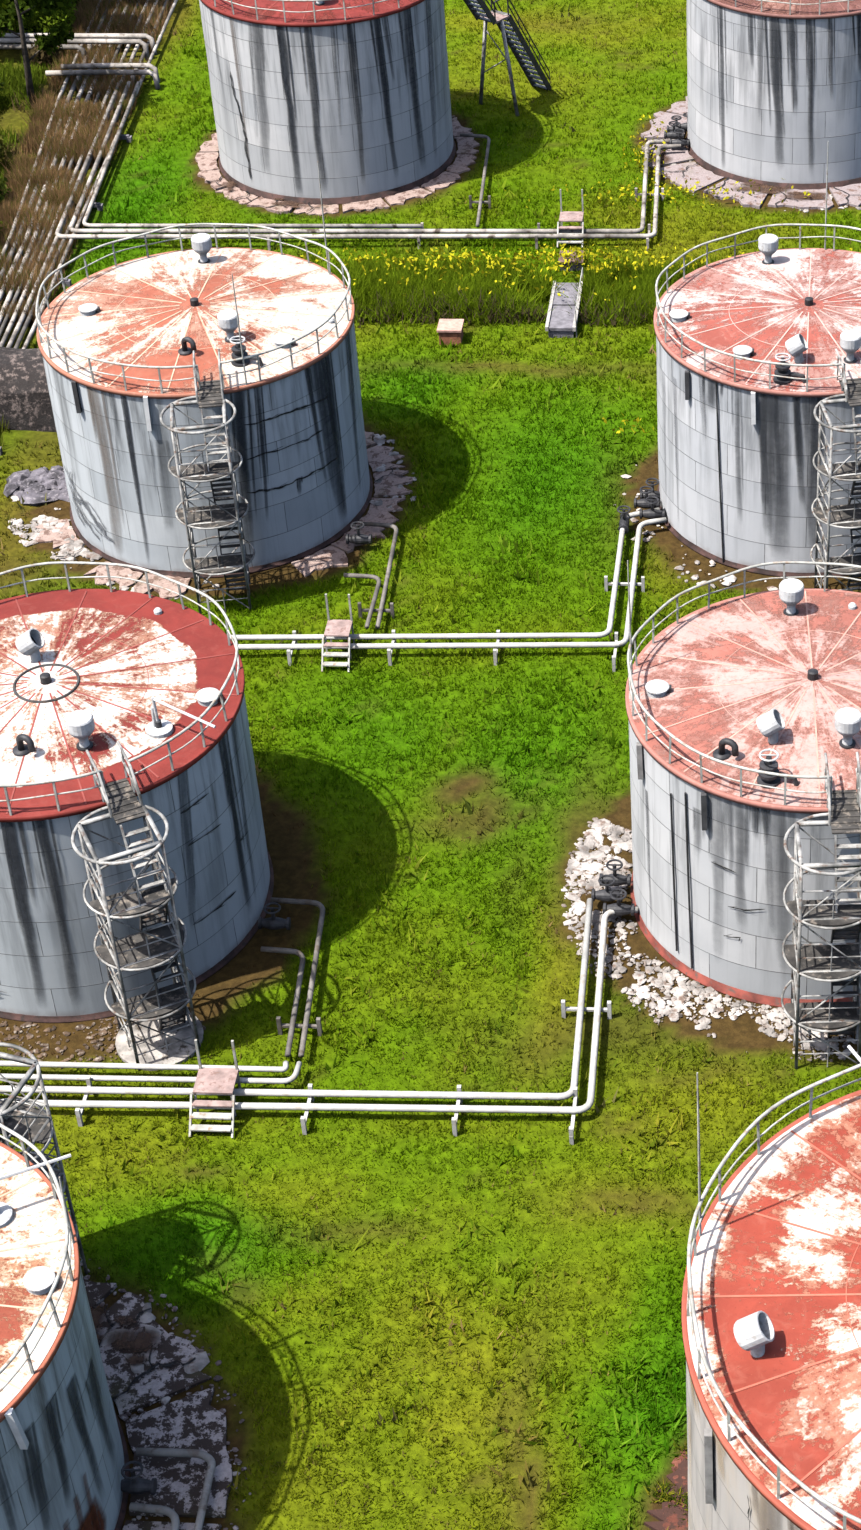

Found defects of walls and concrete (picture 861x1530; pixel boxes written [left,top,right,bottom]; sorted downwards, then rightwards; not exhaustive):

water stain [277,26,323,183]
water stain [333,6,433,158]
water stain [717,6,726,137]
water stain [748,14,861,150]
water stain [87,387,147,546]
water stain [230,386,268,530]
water stain [305,332,357,502]
water stain [760,393,823,525]
water stain [218,722,250,897]
water stain [0,819,75,991]
water stain [23,1358,110,1512]
rust [75,1476,106,1530]